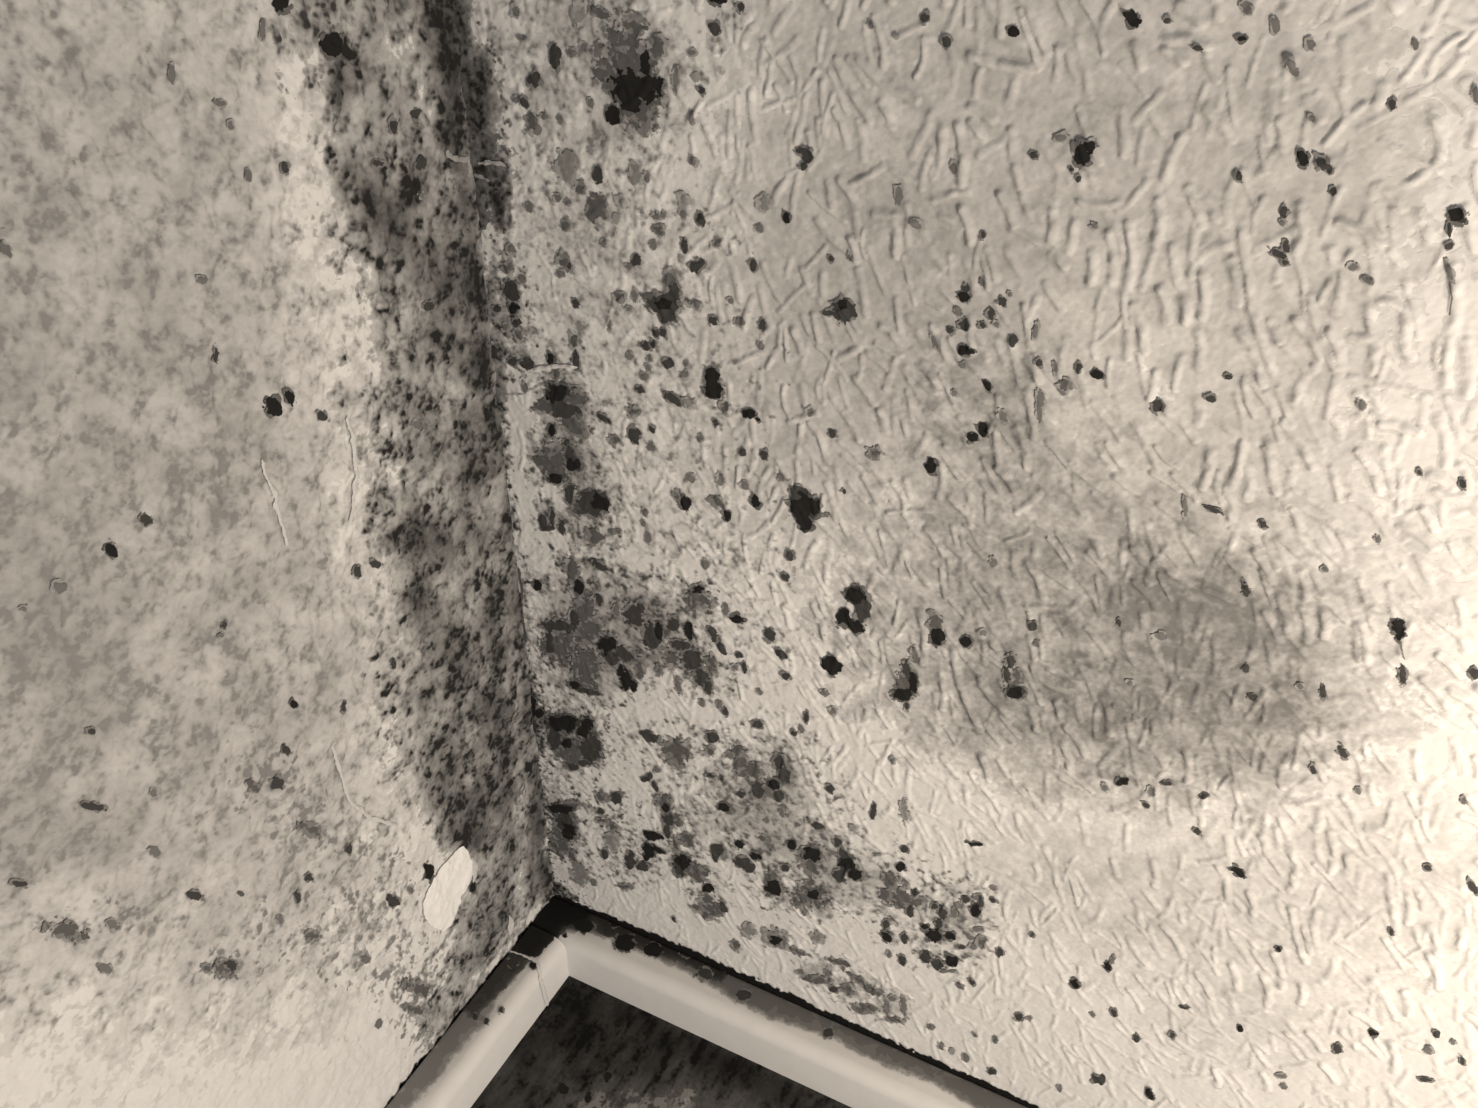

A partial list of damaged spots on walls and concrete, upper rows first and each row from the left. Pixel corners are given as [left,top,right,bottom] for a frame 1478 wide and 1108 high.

leakage [280,161,291,177]
leakage [262,386,297,419]
leakage [351,564,362,580]
leakage [422,860,435,884]
leakage [186,889,205,902]
leakage [729,922,758,954]
leakage [784,926,918,1028]
leakage [1069,977,1082,990]
leakage [1013,1012,1033,1022]
leakage [471,976,852,1108]
leakage [1423,1030,1467,1066]
leakage [1090,1074,1106,1085]